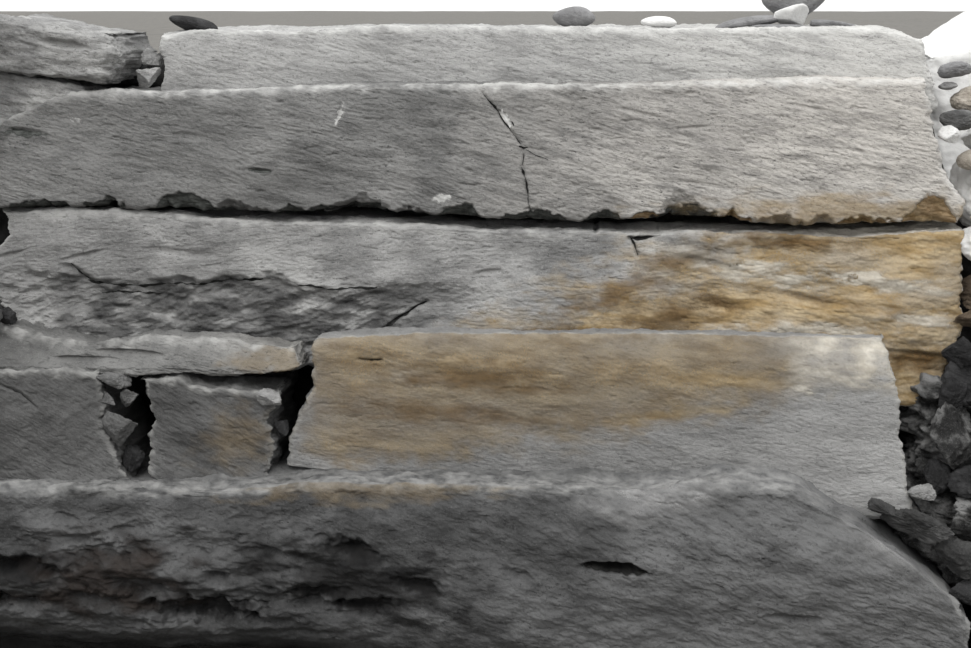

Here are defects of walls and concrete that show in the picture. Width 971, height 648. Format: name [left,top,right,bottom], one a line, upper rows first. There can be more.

crack [484,95,548,211]
crack [386,301,427,327]